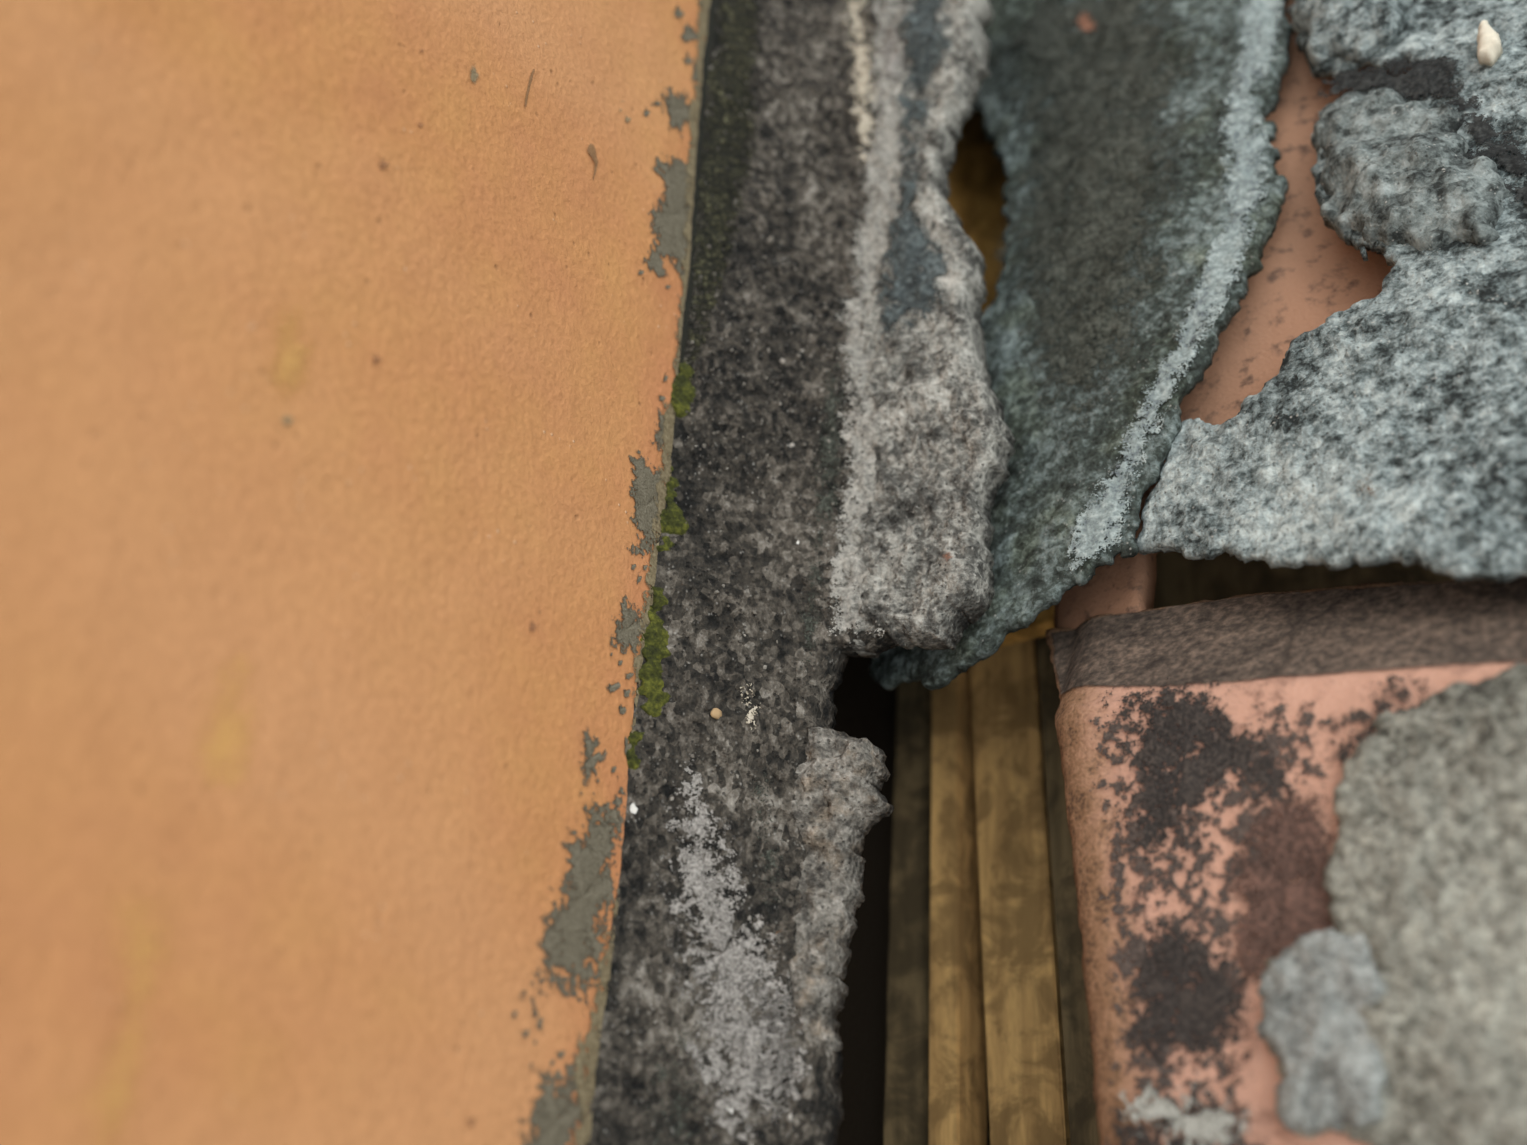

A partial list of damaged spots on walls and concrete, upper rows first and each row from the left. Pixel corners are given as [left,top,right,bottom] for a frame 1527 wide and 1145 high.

peeling [512,0,711,1145]
spalling [789,727,894,1052]
leakage [1051,576,1527,1145]